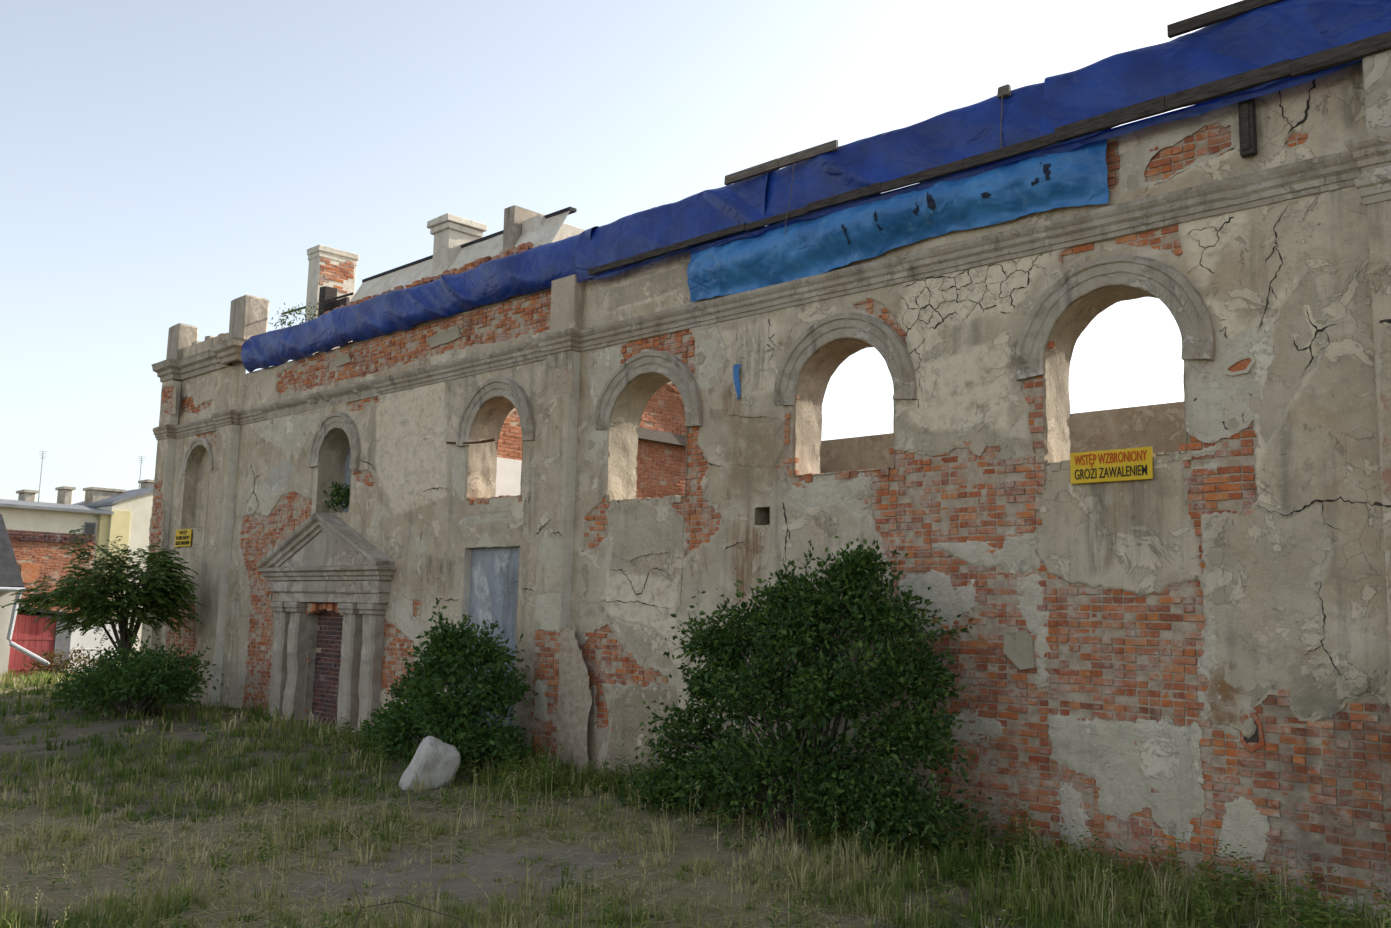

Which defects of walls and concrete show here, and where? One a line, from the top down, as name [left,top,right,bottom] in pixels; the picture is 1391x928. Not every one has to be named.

flaking render [1105,111,1240,193]
crack [1278,79,1316,144]
flaking render [319,257,354,294]
flaking render [276,287,551,393]
crack [1186,217,1233,274]
crack [1220,207,1336,377]
flaking render [672,426,721,556]
crack [1262,496,1391,530]
flaking render [240,478,312,713]
flaking render [519,593,682,777]
flaking render [775,272,1391,906]
crack [1305,586,1362,681]